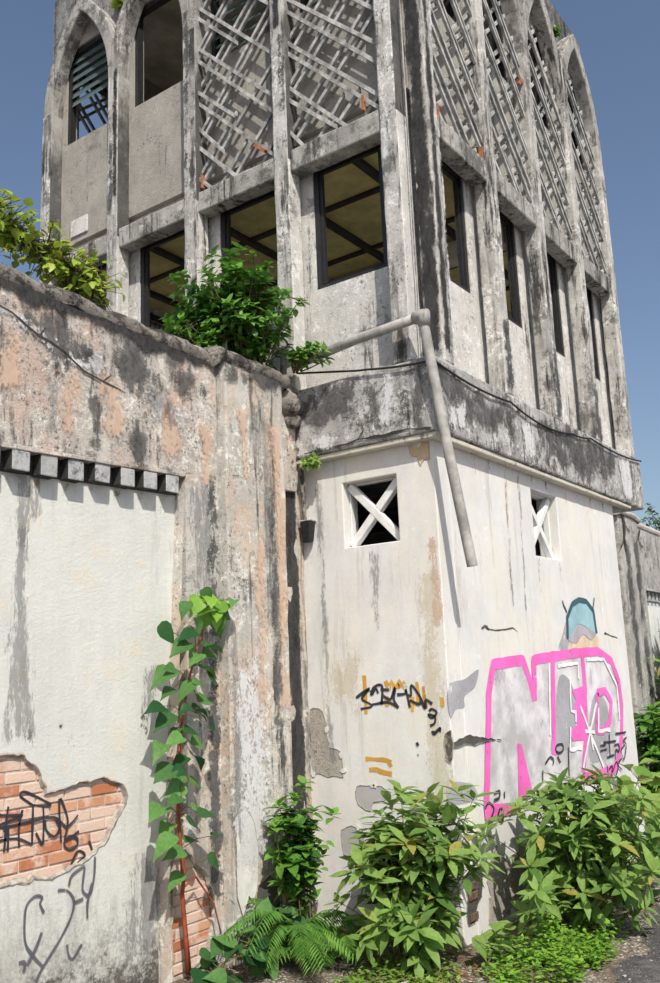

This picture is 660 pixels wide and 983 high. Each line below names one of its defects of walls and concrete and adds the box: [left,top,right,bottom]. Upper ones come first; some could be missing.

damp [381,97,389,160]
damp [398,0,452,429]
peeling [0,331,24,389]
damp [0,277,209,463]
damp [302,366,395,449]
peeling [408,441,430,466]
damp [503,318,516,388]
damp [437,358,635,501]
peeling [309,708,346,778]
flaking render [0,753,128,889]
flaking render [169,849,216,982]
flaking render [463,843,533,927]